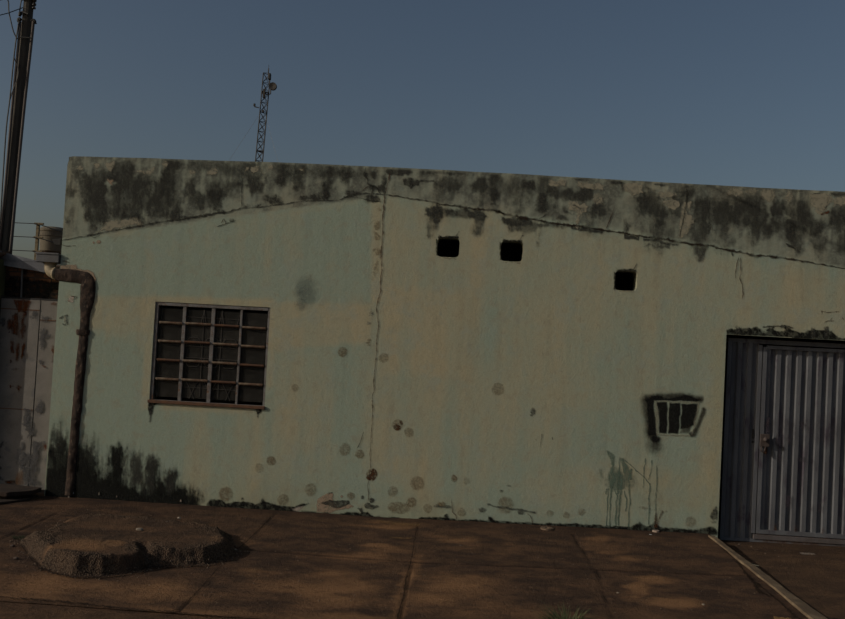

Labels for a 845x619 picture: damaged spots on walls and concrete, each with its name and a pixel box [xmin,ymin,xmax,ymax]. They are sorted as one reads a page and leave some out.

water stain [76,161,282,229]
crack [64,170,294,246]
water stain [275,165,351,200]
water stain [346,169,460,202]
water stain [624,184,845,261]
crack [316,172,845,499]
water stain [45,436,316,513]
spalling [317,492,354,513]
water stain [340,496,380,517]
water stain [419,451,718,535]